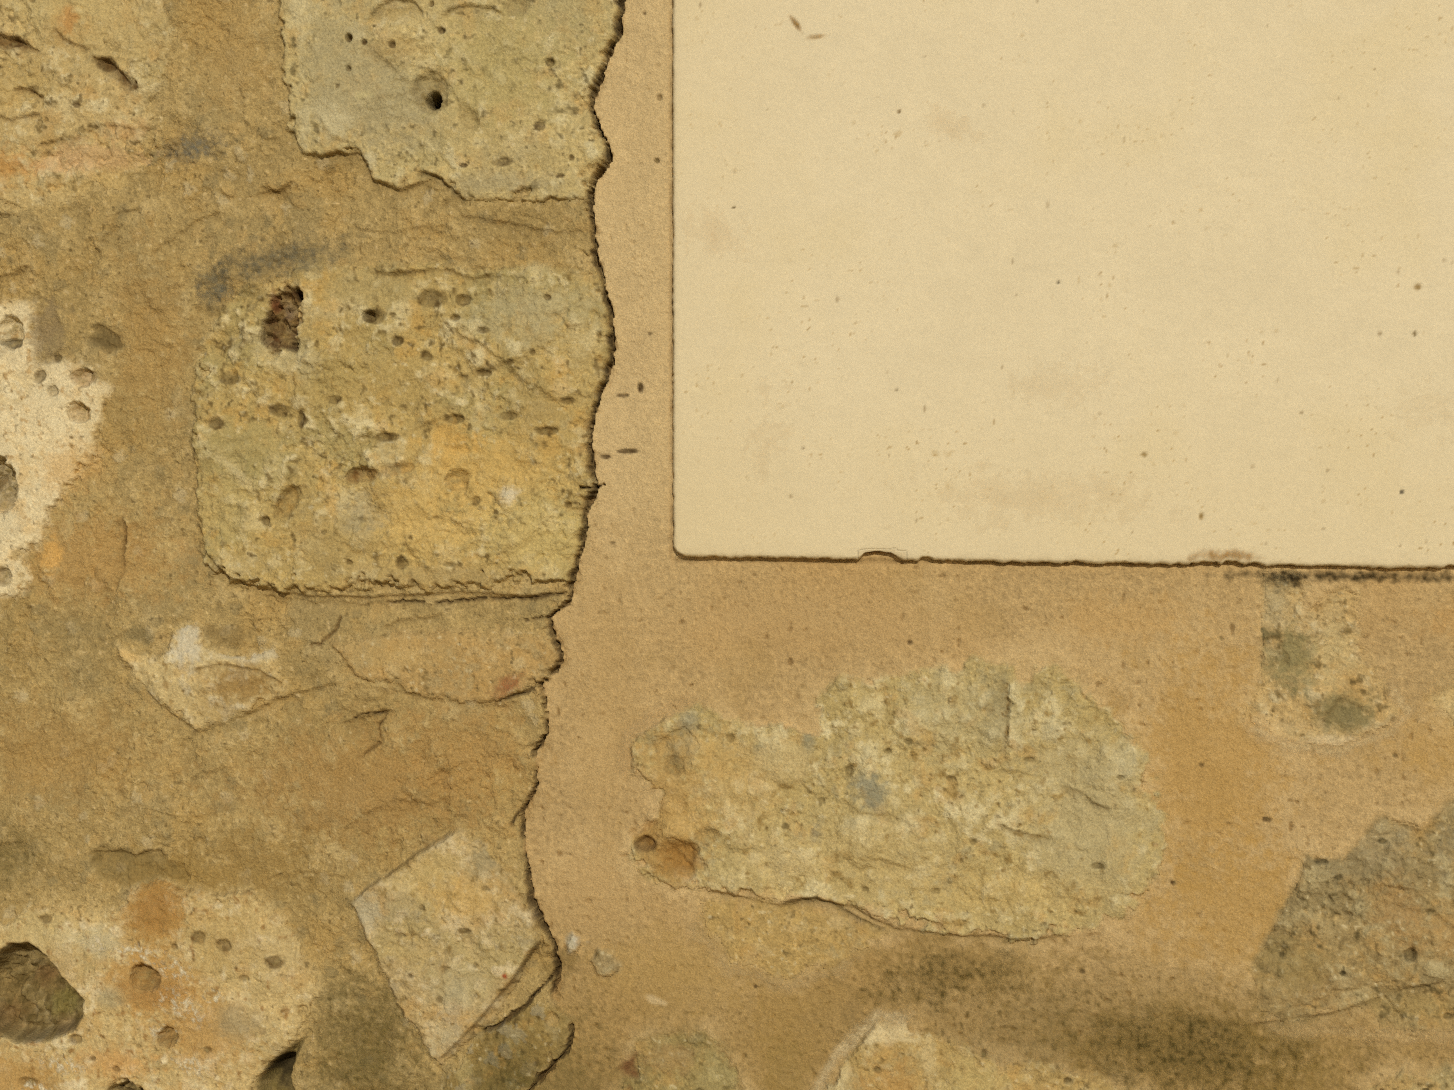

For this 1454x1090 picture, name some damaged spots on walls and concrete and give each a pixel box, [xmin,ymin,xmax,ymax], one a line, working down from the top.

crack [382,0,626,1090]